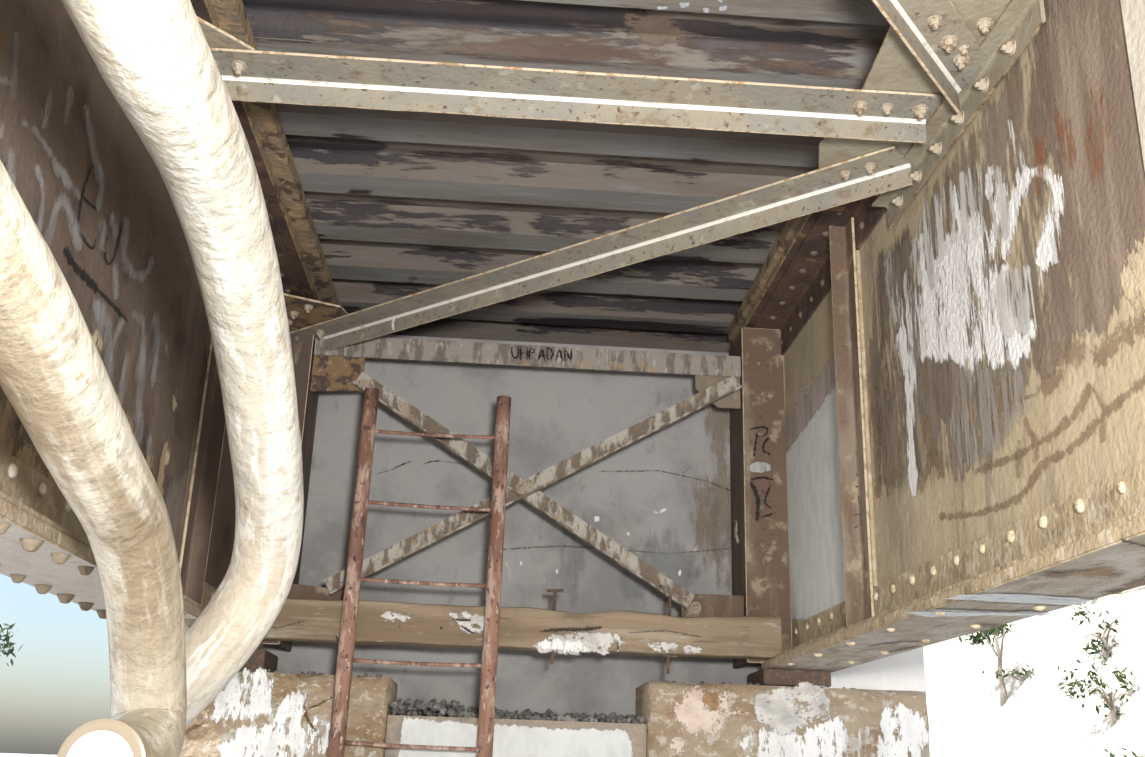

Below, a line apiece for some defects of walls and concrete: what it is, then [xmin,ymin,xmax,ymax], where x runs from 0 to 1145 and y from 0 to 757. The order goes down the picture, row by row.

peeling [116,391,189,550]
peeling [380,611,411,622]
peeling [449,611,484,634]
peeling [533,631,626,655]
peeling [647,641,702,654]
peeling [206,668,331,757]
peeling [666,682,931,757]